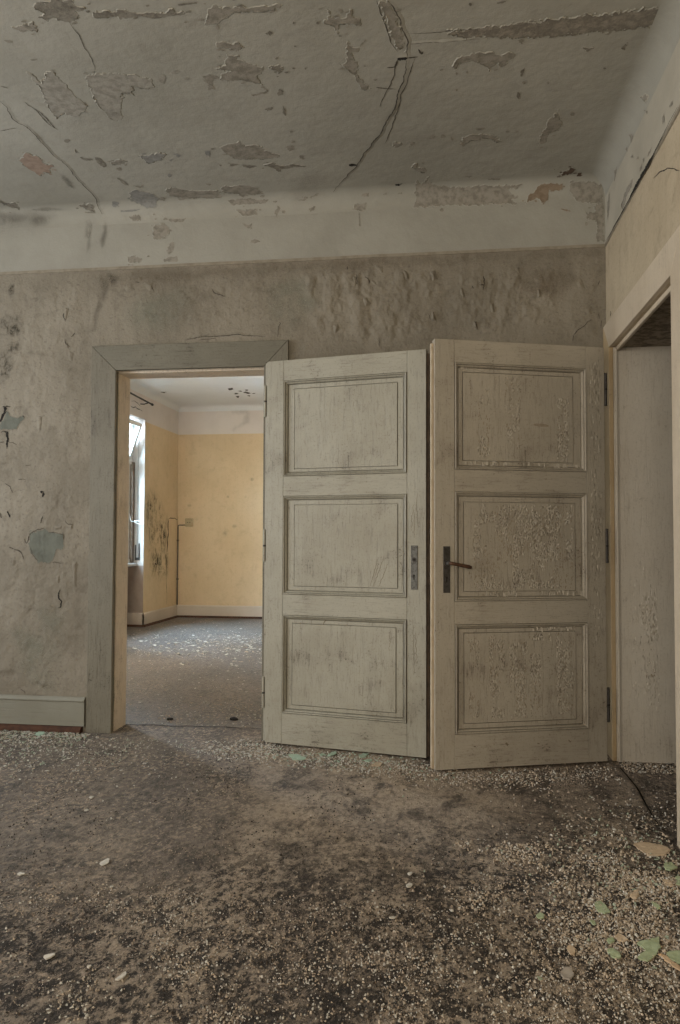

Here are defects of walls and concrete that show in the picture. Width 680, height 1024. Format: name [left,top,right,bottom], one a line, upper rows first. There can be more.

crack [0,86,104,214]
peeling [4,0,306,119]
peeling [64,139,285,262]
peeling [204,131,306,172]
peeling [316,8,381,90]
crack [334,0,480,193]
peeling [383,134,651,243]
peeling [440,6,659,75]
peeling [27,528,65,564]